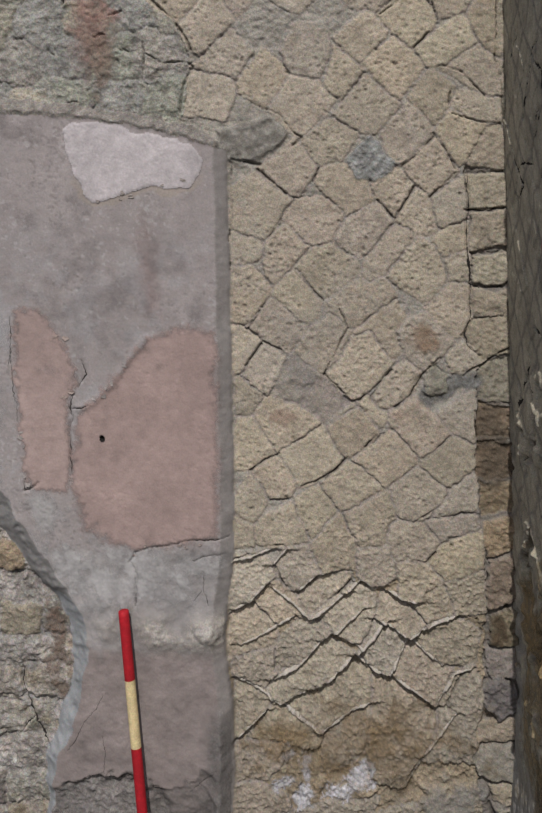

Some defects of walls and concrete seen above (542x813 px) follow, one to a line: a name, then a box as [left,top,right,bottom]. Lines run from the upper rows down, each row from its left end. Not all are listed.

flaking render [12,306,220,556]
flaking render [0,491,137,813]
crack [23,666,49,742]
flaking render [146,782,177,813]
damp [272,756,376,812]